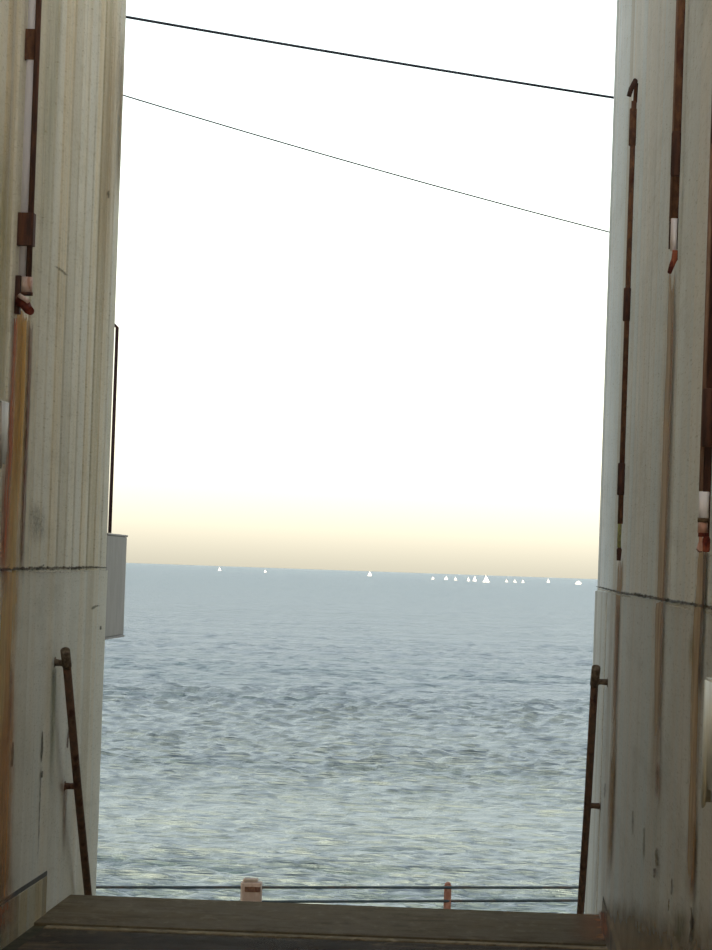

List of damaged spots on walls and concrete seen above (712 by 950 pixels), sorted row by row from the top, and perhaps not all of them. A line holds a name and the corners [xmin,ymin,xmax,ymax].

corrosion [0,310,32,898]
corrosion [655,274,674,727]
corrosion [688,551,706,887]